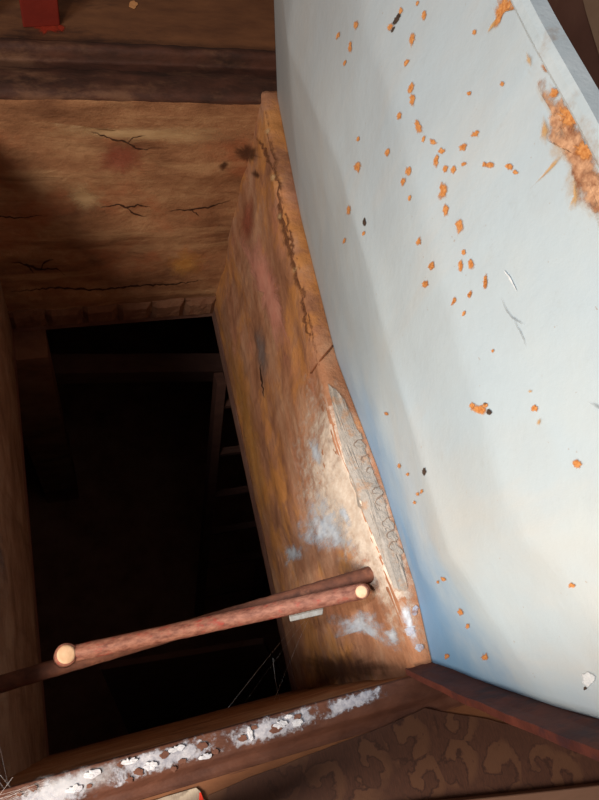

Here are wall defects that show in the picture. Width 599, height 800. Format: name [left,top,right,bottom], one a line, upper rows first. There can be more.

crack [100,135,149,150]
crack [101,204,150,216]
crack [170,201,228,216]
leakage [304,407,407,604]